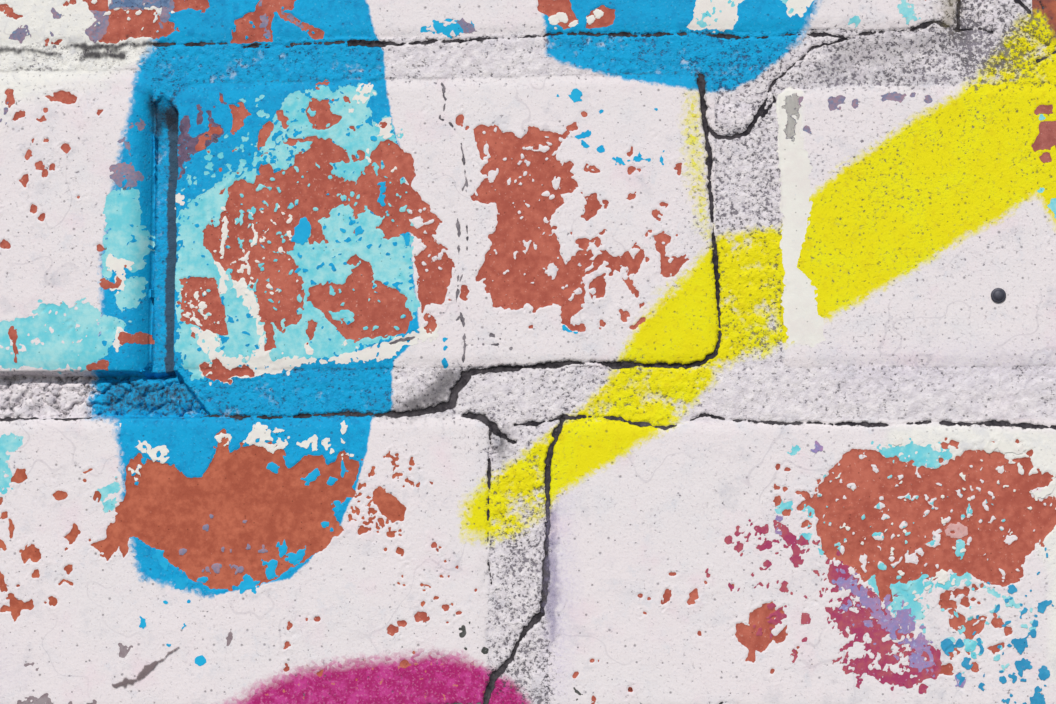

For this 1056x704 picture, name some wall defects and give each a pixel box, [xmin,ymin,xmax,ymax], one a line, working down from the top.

peeling [51,0,210,44]
peeling [537,0,615,30]
peeling [687,0,744,33]
peeling [781,0,814,17]
peeling [1031,104,1056,163]
peeling [174,79,689,386]
crack [153,0,994,704]
crack [906,420,1056,429]
peeling [0,433,41,578]
peeling [64,421,433,603]
peeling [0,564,73,622]
peeling [724,437,1056,704]